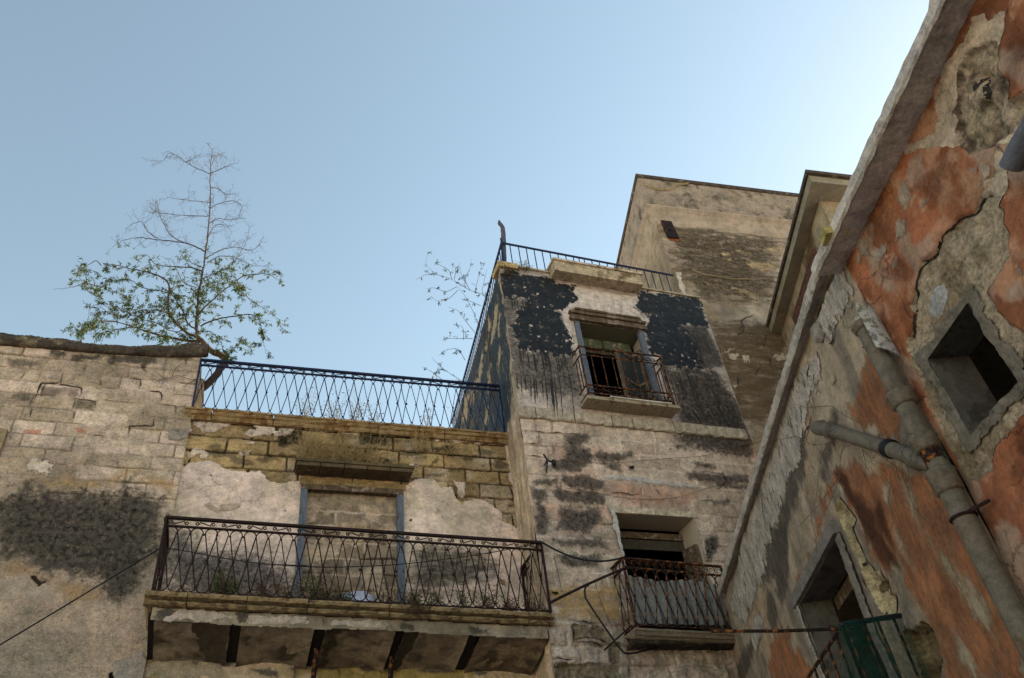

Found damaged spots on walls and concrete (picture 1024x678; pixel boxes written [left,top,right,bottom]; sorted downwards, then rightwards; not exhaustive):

water stain [669,228,783,302]
peeling [896,180,925,238]
crack [895,195,994,338]
spalling [904,6,1024,481]
spalling [183,270,578,528]
peeling [847,356,900,439]
water stain [0,477,295,599]
peeling [816,459,1024,678]